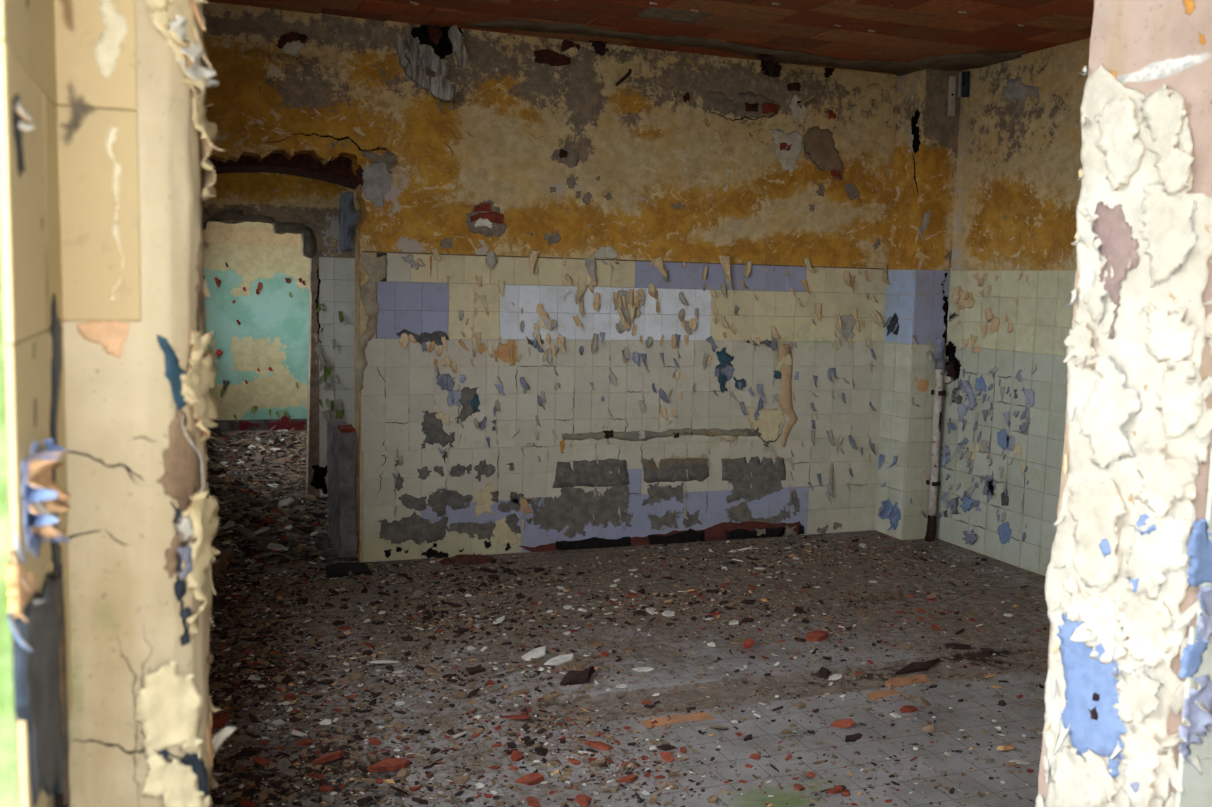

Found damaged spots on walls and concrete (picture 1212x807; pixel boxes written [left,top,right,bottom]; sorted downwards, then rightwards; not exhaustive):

peeling [395,21,1030,101]
crack [265,133,390,154]
spalling [550,147,613,205]
flaking render [683,90,780,121]
spalling [802,110,861,211]
spalling [906,109,921,193]
peeling [377,200,1037,559]
crack [66,437,156,484]
peeling [1035,64,1212,807]
peeling [6,439,71,807]
peeling [544,654,574,665]
peeling [134,652,237,807]